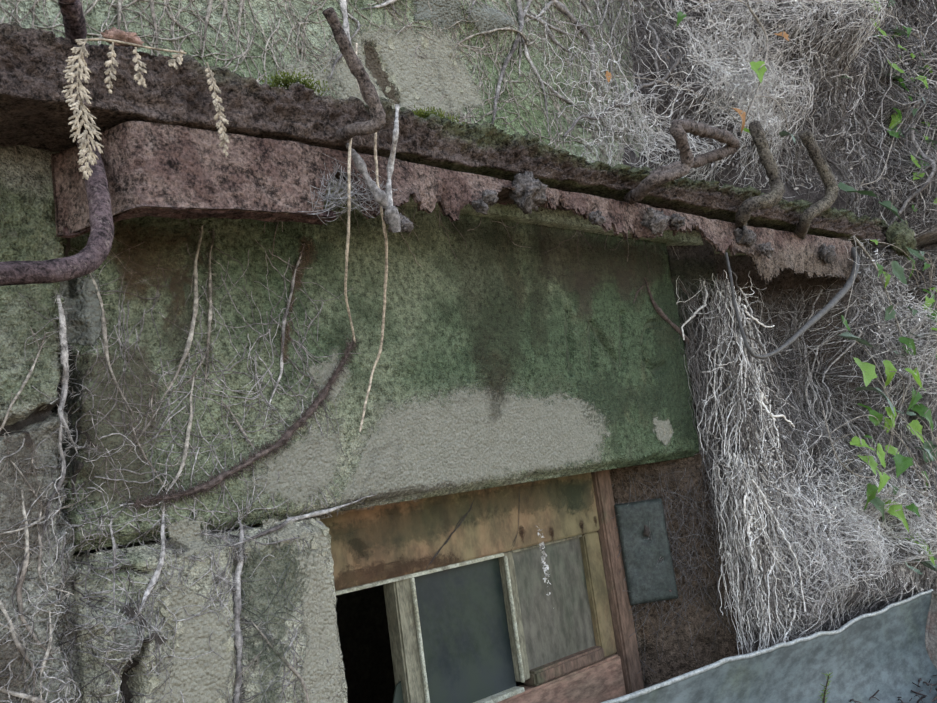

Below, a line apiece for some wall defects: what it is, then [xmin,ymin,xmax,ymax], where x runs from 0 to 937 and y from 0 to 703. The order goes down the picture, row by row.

corrosion [640,207,685,235]
crack [64,238,72,257]
peeling [653,417,674,445]